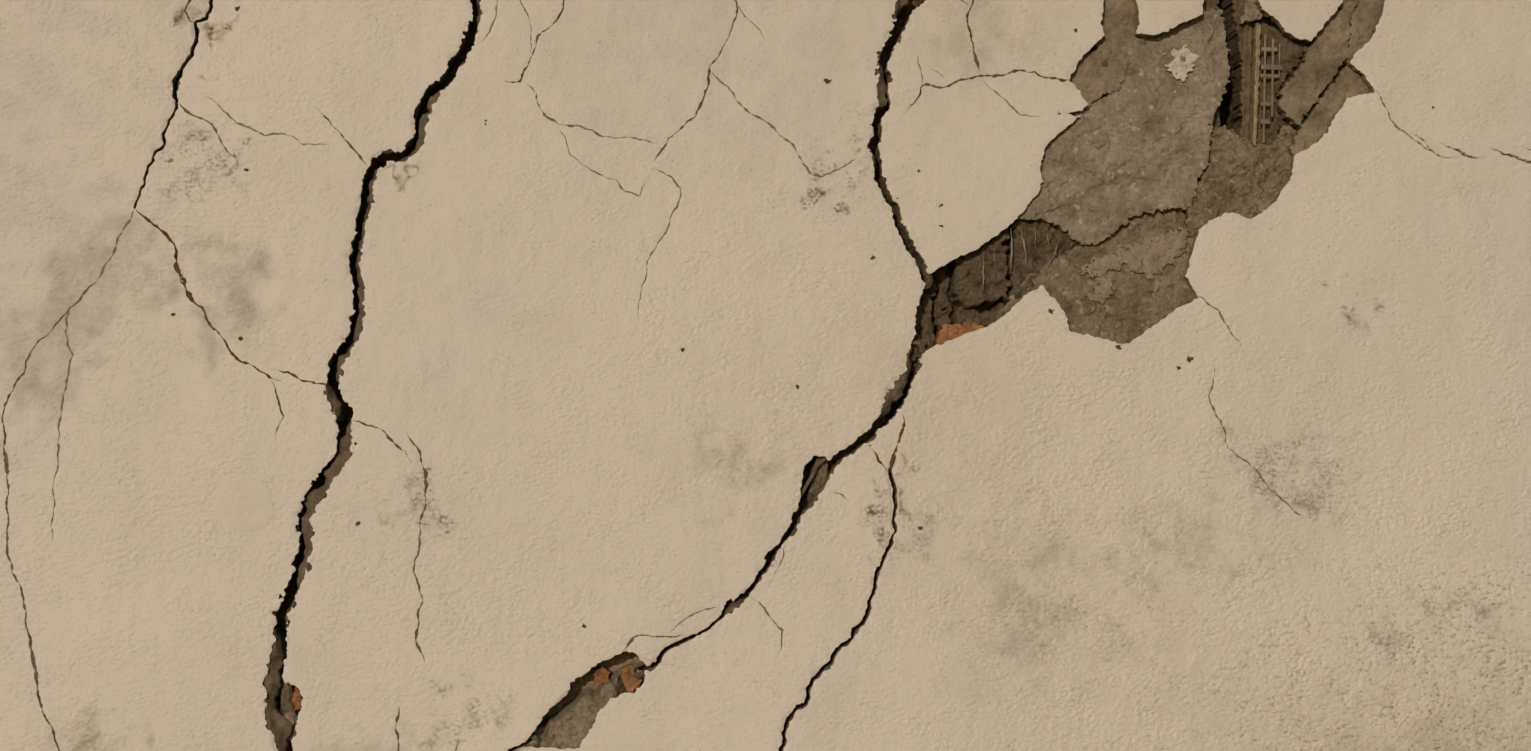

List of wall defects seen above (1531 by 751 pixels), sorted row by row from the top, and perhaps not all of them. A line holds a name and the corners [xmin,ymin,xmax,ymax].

spalling [909,0,1383,371]
crack [1376,90,1531,164]
crack [1,0,1066,751]
crack [1199,296,1303,517]
spalling [522,651,644,748]